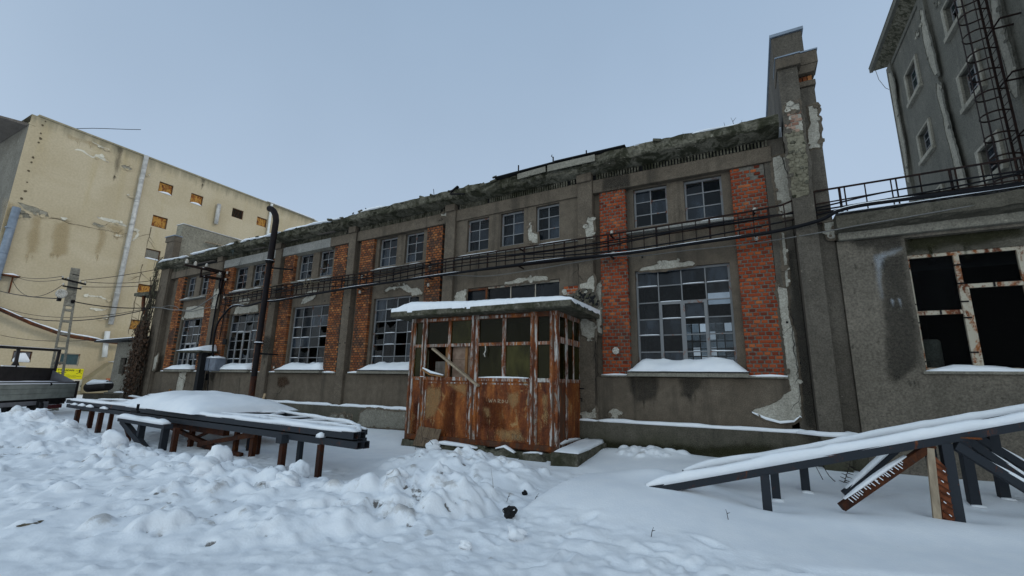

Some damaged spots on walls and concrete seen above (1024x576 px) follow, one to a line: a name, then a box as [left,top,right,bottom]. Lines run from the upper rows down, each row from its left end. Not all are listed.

peeling [526,221,540,245]
peeling [583,215,596,241]
peeling [636,257,695,273]
peeling [750,98,825,425]
peeling [382,281,424,297]
peeling [503,274,550,286]
water stain [855,228,1023,378]